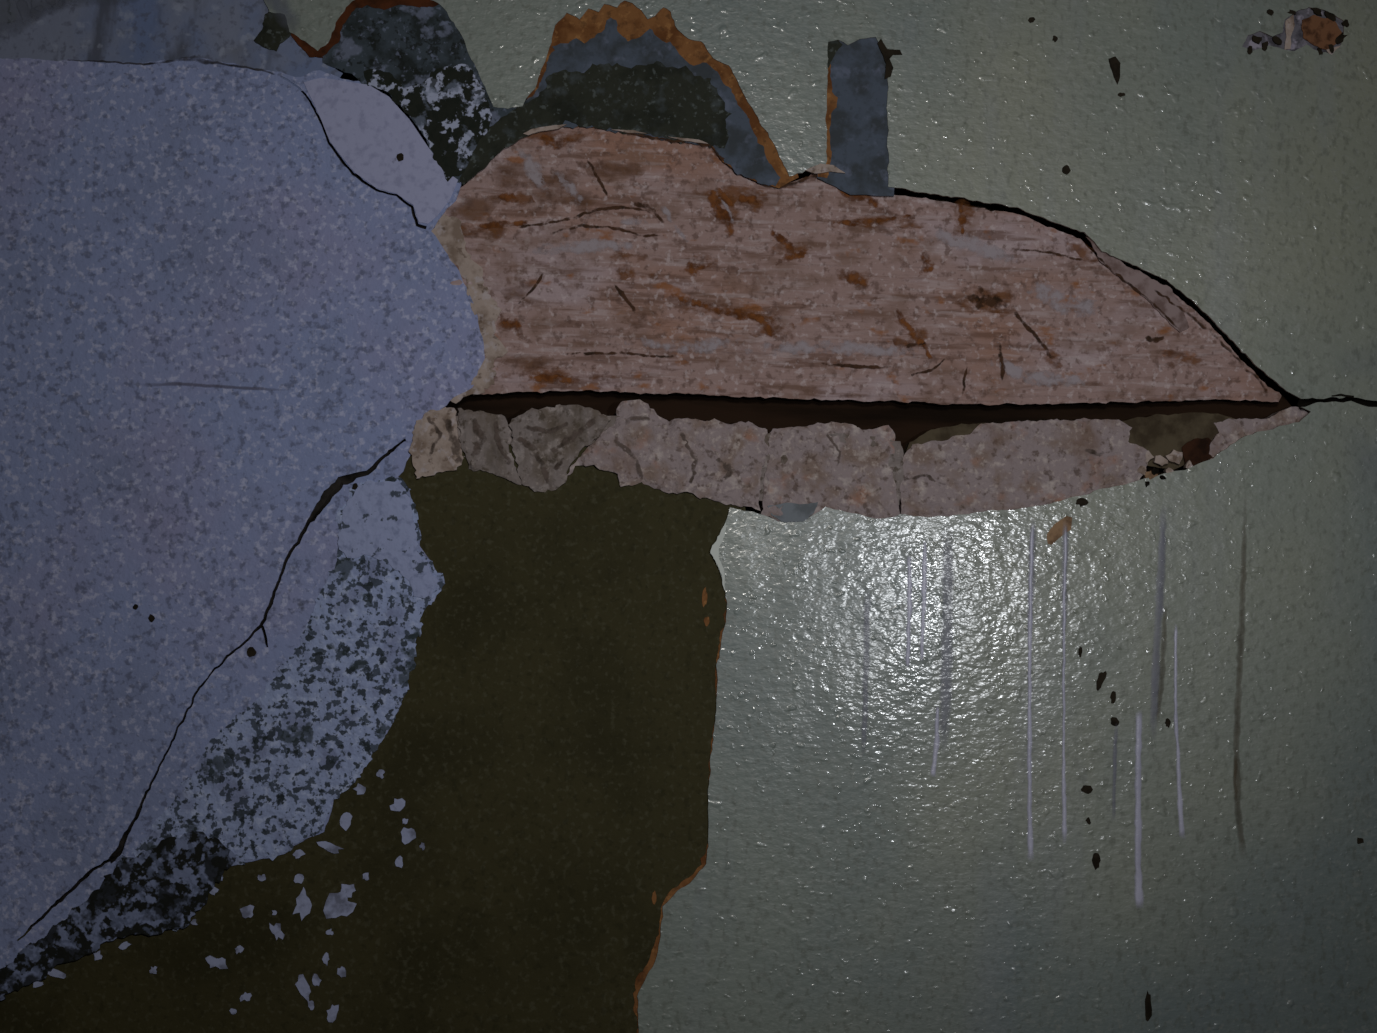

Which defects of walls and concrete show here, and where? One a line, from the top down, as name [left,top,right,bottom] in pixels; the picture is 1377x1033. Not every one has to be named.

crack [68,56,273,74]
spalling [1242,8,1349,55]
crack [301,91,426,229]
spalling [409,38,1308,522]
crack [1297,394,1377,409]
flaking render [0,0,799,1033]
leakage [906,543,927,665]
crack [28,439,406,930]
leakage [931,708,939,775]
peeling [1096,671,1119,726]
leakage [1135,716,1143,904]
leakage [1174,630,1184,833]